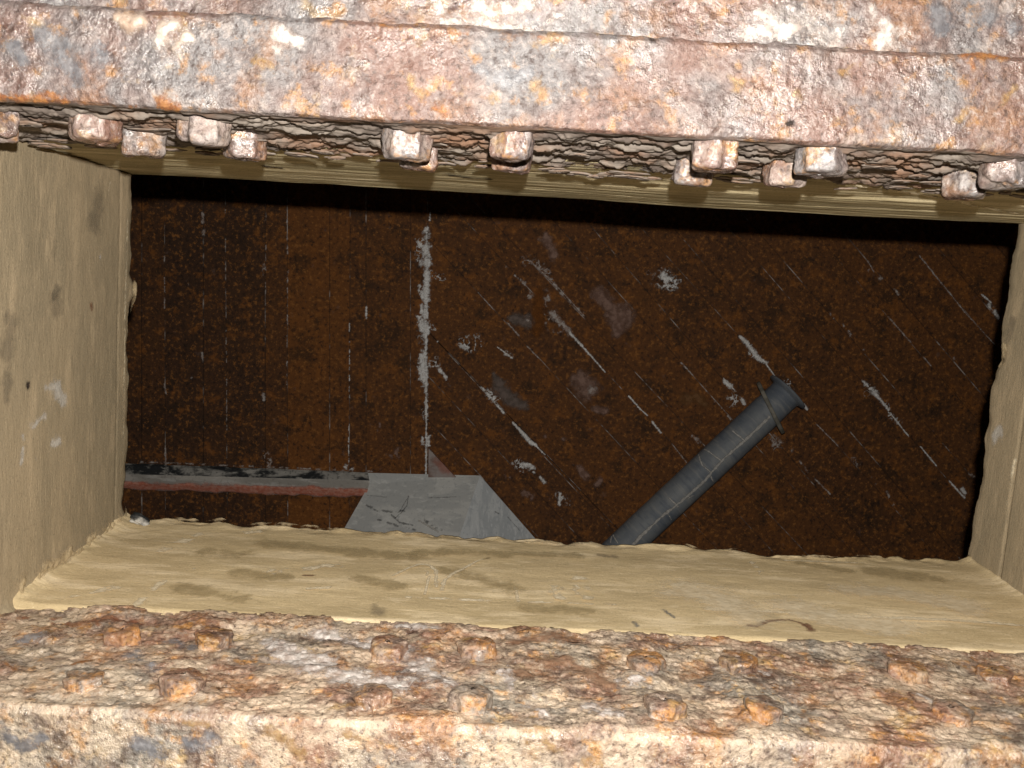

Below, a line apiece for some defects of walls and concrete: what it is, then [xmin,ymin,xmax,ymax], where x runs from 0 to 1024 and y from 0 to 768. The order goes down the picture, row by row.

rust [961,52,1008,69]
rust [0,91,67,104]
rust [155,96,181,111]
peeling [267,149,399,163]
peeling [538,167,662,181]
water stain [658,271,678,290]
water stain [416,212,448,474]
rust [51,615,143,626]
rust [747,619,814,631]
rust [507,632,579,645]
rust [539,655,616,689]
rust [266,727,306,760]